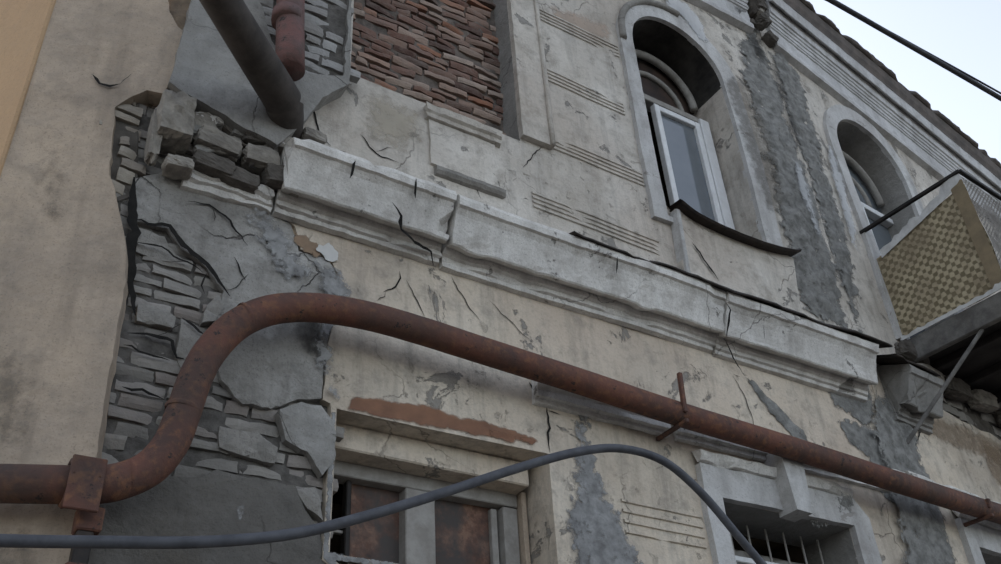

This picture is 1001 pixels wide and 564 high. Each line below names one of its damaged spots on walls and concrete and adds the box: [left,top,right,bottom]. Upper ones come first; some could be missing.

crack [93,75,130,87]
flaking render [168,0,191,30]
flaking render [304,0,361,84]
crack [126,177,246,361]
flaking render [102,102,338,464]
crack [378,271,425,317]
crack [392,180,535,345]
crack [693,244,718,279]
crack [122,386,164,400]
flaking render [88,322,345,564]
crack [726,303,754,424]
flaking render [894,339,1001,440]